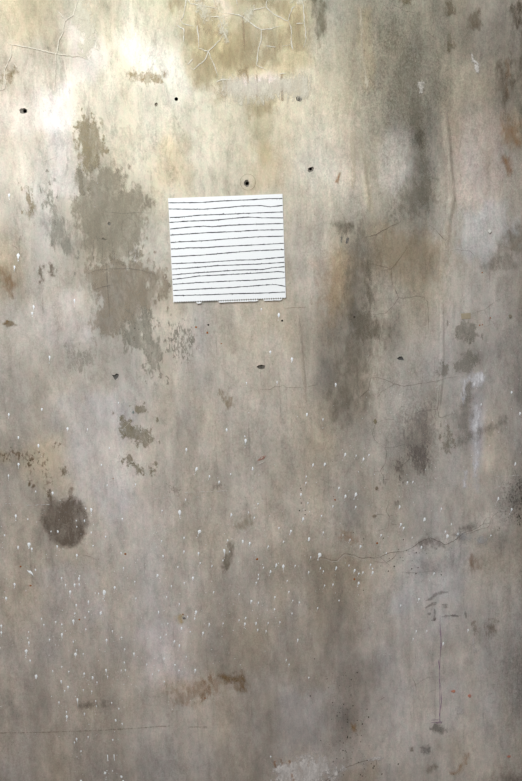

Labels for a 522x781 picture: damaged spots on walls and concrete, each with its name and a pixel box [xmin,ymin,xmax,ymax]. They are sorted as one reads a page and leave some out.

crack [177,0,306,82]
water stain [43,492,87,546]